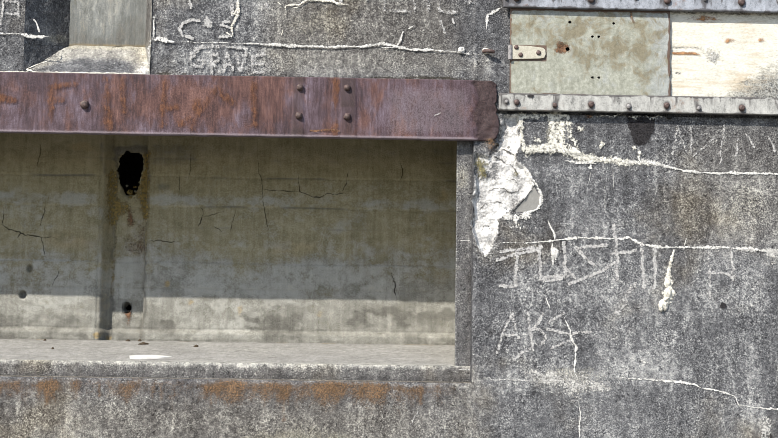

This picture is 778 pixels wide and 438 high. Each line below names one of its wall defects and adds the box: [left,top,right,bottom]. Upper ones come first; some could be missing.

damp [516,111,662,166]
spalling [117,151,144,199]
crack [258,163,348,227]
spalling [470,114,543,264]
crack [567,156,778,210]
crack [2,208,49,255]
crack [503,221,778,252]
rust [204,380,423,408]
crack [622,377,778,410]